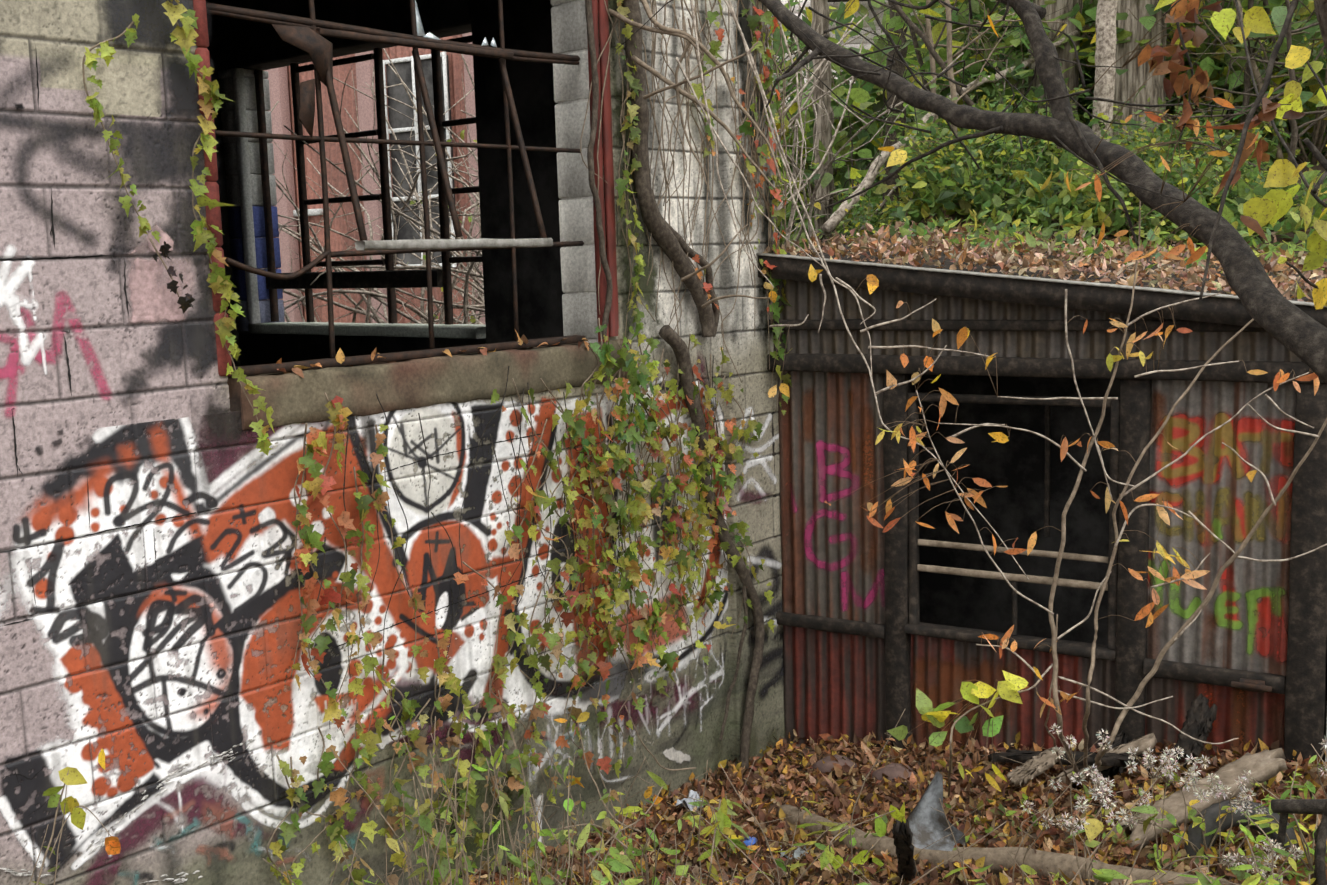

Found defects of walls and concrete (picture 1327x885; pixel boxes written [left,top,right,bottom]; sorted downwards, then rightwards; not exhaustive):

damp [608,0,661,338]
damp [701,0,776,295]
damp [757,278,773,338]
rust [779,392,813,565]
rust [848,391,875,505]
rust [914,659,1017,753]